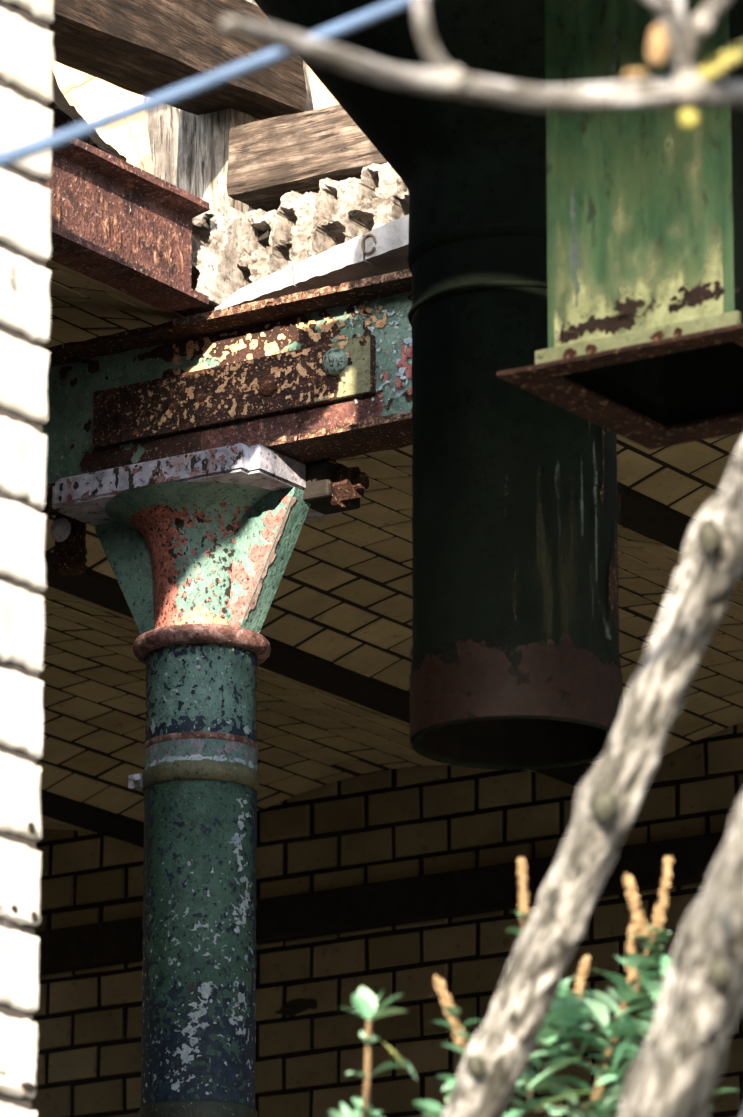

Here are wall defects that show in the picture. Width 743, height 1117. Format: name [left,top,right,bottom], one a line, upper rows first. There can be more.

corrosion [100,200,121,247]
corrosion [136,229,183,265]
corrosion [133,302,371,378]
peeling [124,446,237,487]
corrosion [59,390,412,501]
peeling [130,495,296,629]
peeling [144,643,257,771]
corrosion [410,636,623,745]
peeling [141,781,257,1108]